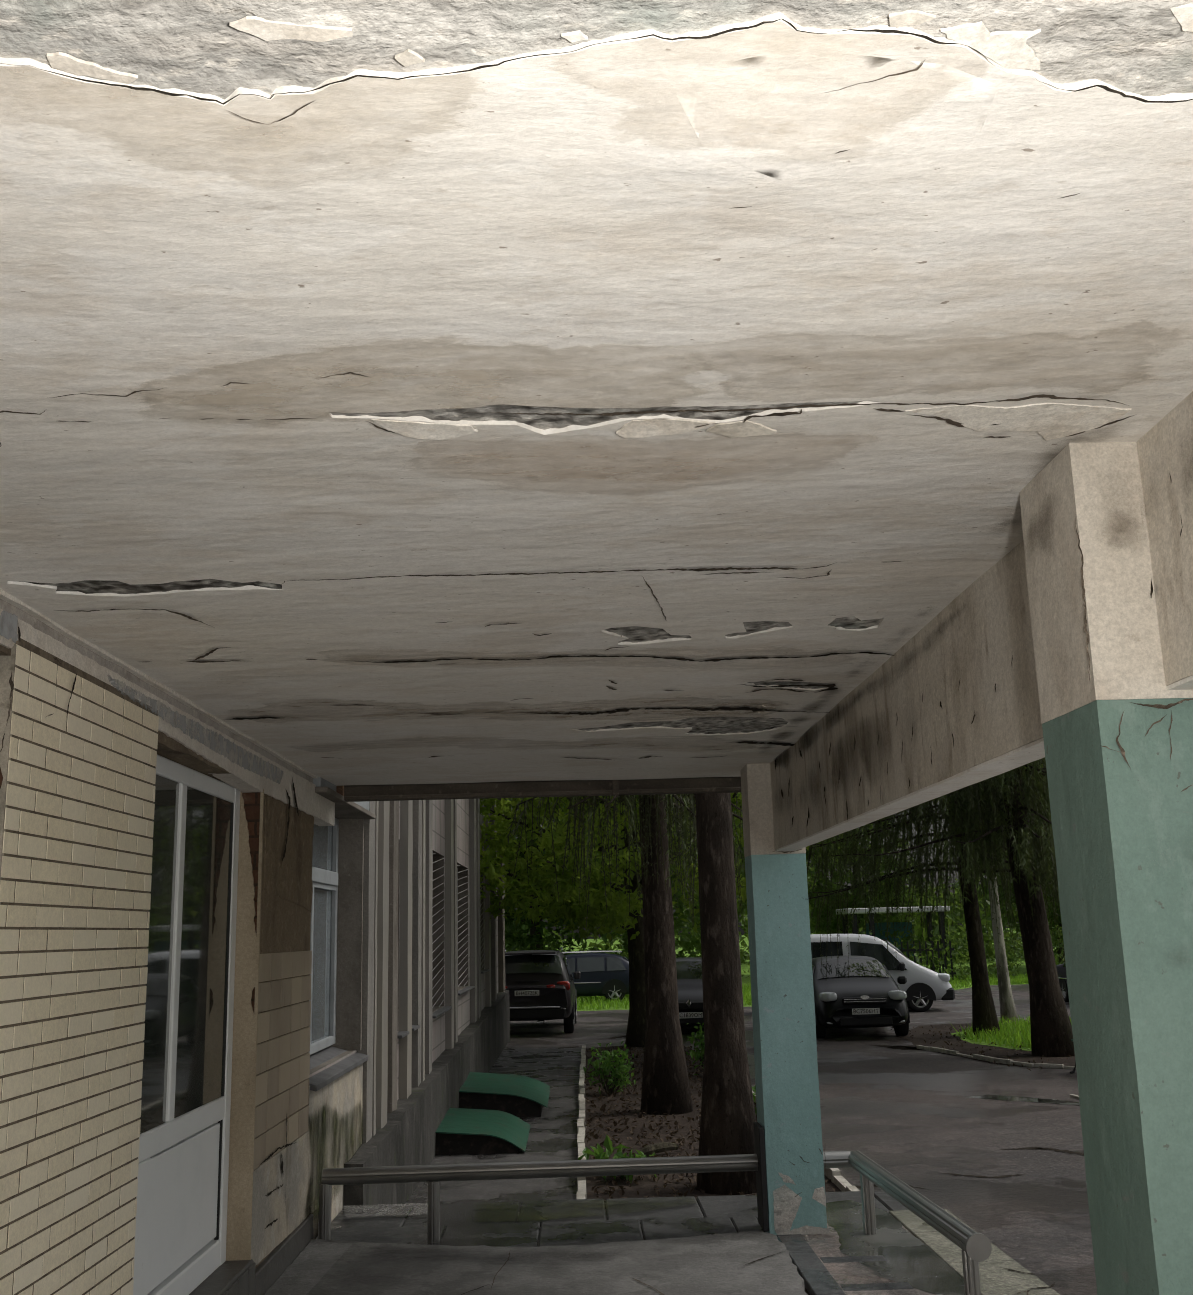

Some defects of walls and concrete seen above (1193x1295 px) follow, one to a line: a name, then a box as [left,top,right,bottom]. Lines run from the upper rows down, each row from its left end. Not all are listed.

flaking render [0,0,1193,105]
crack [202,415,311,423]
crack [466,394,1137,439]
crack [282,563,834,621]
crack [1075,517,1090,680]
flaking render [605,626,691,643]
crack [227,714,280,722]
crack [307,623,894,760]
water stain [775,705,844,766]
crack [1100,698,1193,769]
peeling [773,1172,830,1235]